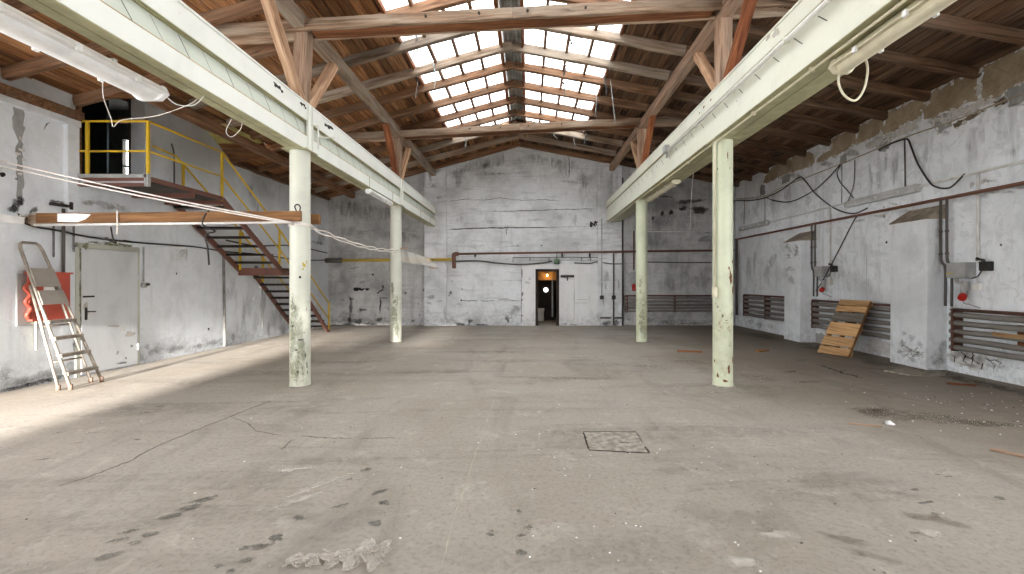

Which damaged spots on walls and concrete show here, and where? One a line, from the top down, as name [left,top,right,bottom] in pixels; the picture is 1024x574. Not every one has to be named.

spalling [763,46,1024,189]
damp [8,197,37,216]
crack [59,401,368,486]